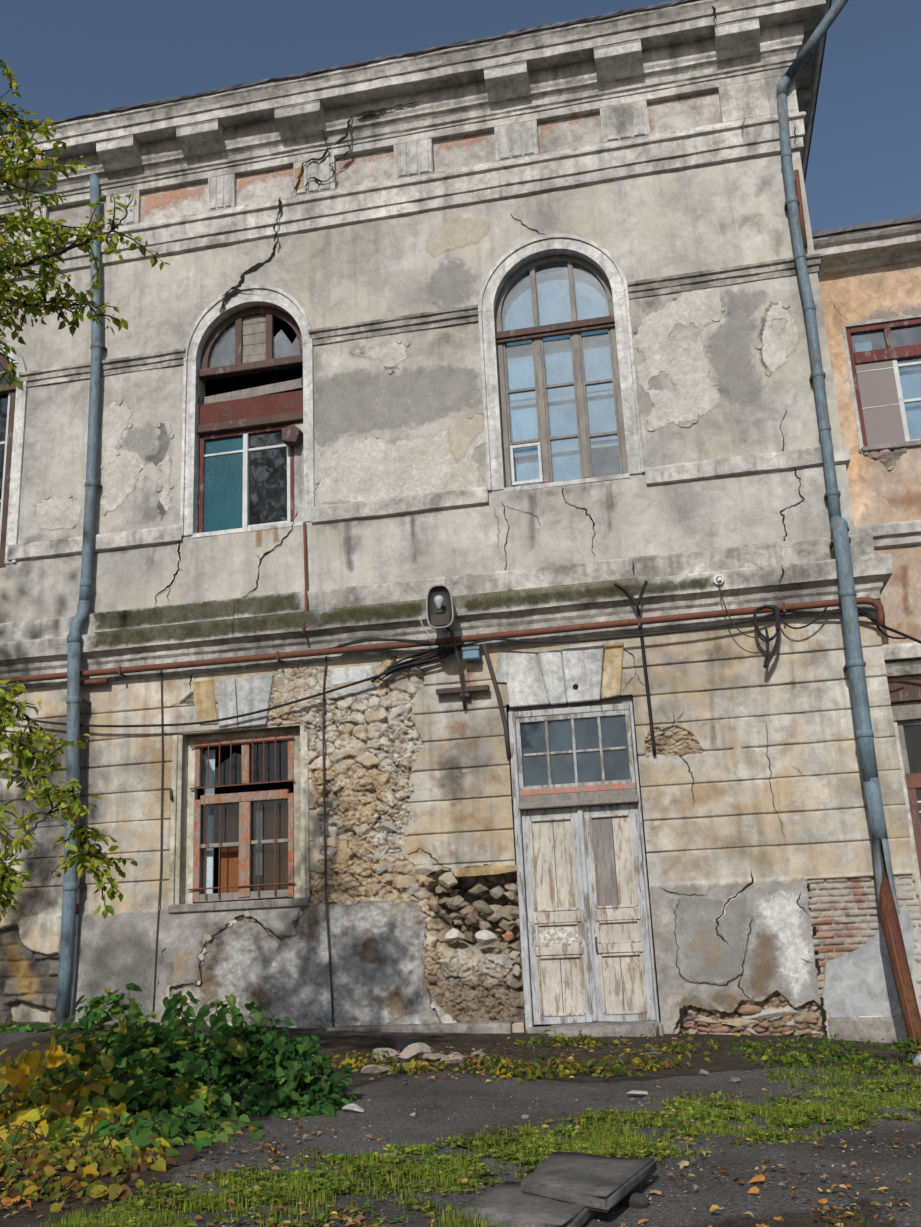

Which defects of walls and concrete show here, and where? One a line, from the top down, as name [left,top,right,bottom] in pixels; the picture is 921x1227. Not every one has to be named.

crack [220,100,423,313]
peeling [632,287,725,432]
peeling [755,298,800,376]
peeling [98,399,174,516]
crack [155,542,182,605]
crack [231,511,299,637]
crack [562,485,596,559]
crack [779,410,804,584]
spalling [644,708,705,758]
crack [660,871,755,1034]
flaking render [679,875,902,1038]
flaking render [893,874,921,998]